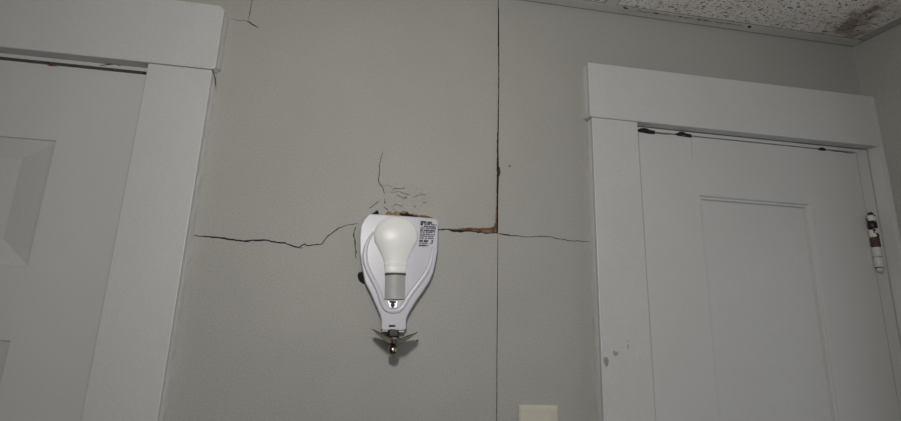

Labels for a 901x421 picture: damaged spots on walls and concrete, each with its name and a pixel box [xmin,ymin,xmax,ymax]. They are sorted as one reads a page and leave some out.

crack [193,224,353,248]
crack [438,0,589,421]